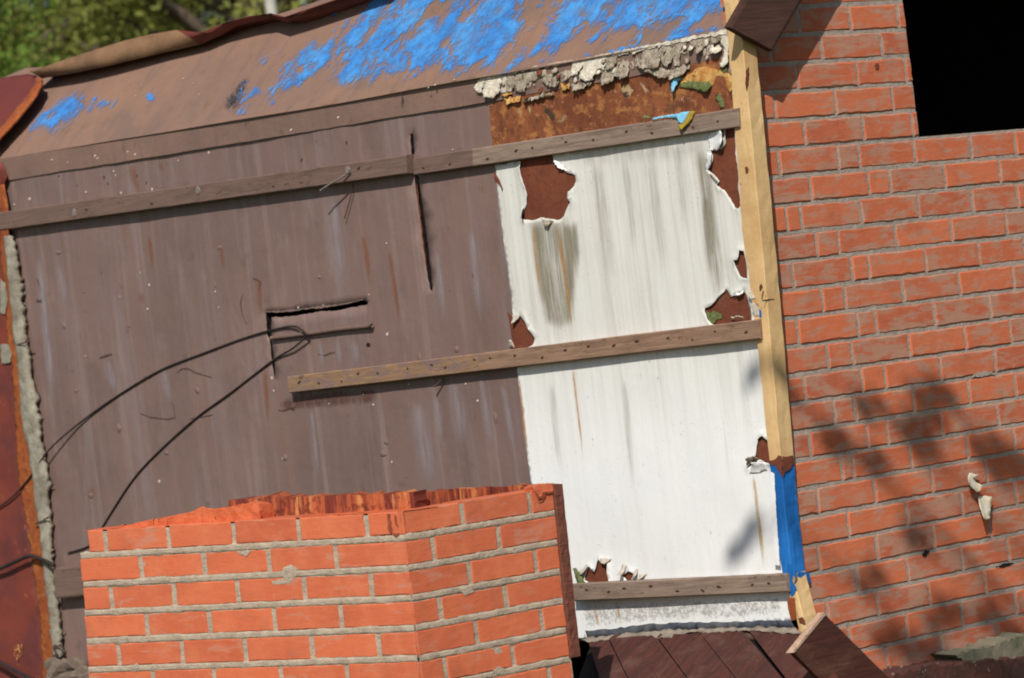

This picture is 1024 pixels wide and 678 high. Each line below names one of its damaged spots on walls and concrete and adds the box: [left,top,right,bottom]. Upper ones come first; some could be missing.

peeling [232,0,732,115]
corrosion [489,58,734,146]
crack [410,134,432,290]
peeling [520,155,576,227]
peeling [705,128,748,209]
crack [240,278,368,377]
peeling [507,312,535,349]
water stain [534,227,578,322]
peeling [705,251,763,325]
corrosion [0,229,53,678]
peeling [573,558,646,583]
peeling [745,436,811,624]